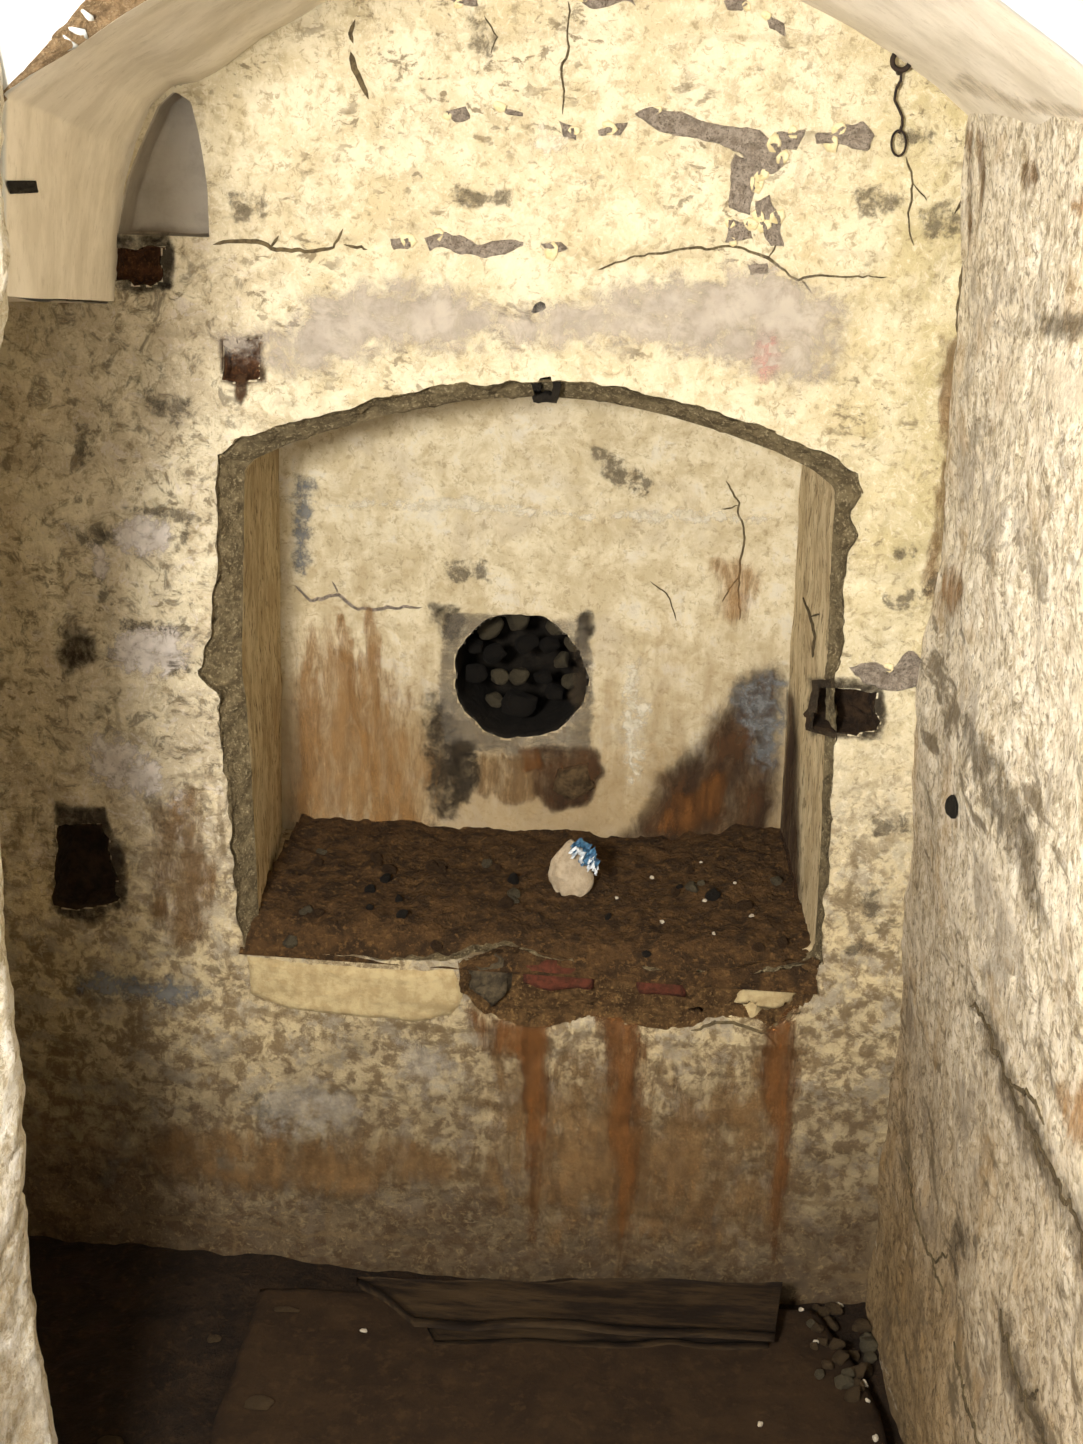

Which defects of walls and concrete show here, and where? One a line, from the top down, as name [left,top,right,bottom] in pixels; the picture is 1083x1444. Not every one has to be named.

flaking render [3,0,146,102]
crack [213,229,368,254]
flaking render [390,228,523,258]
flaking render [219,263,844,404]
flaking render [598,106,875,247]
crack [598,245,886,293]
corrosion [298,608,431,822]
corrosion [470,1013,549,1211]
corrosion [594,1015,646,1235]
corrosion [760,1007,798,1247]
crack [969,1002,1083,1270]
crack [953,1341,982,1444]